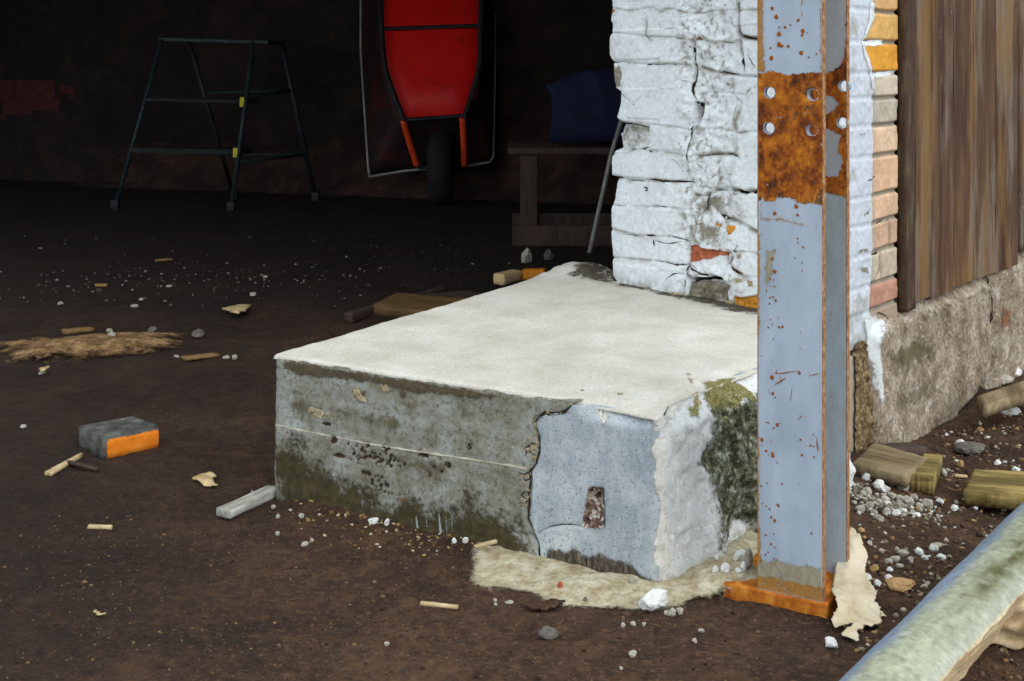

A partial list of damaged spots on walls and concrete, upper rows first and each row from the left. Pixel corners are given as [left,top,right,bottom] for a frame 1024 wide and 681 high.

crack [618,2,757,295]
flaking render [690,244,741,262]
corrosion [757,0,850,603]
water stain [275,434,653,581]
crack [517,405,579,556]